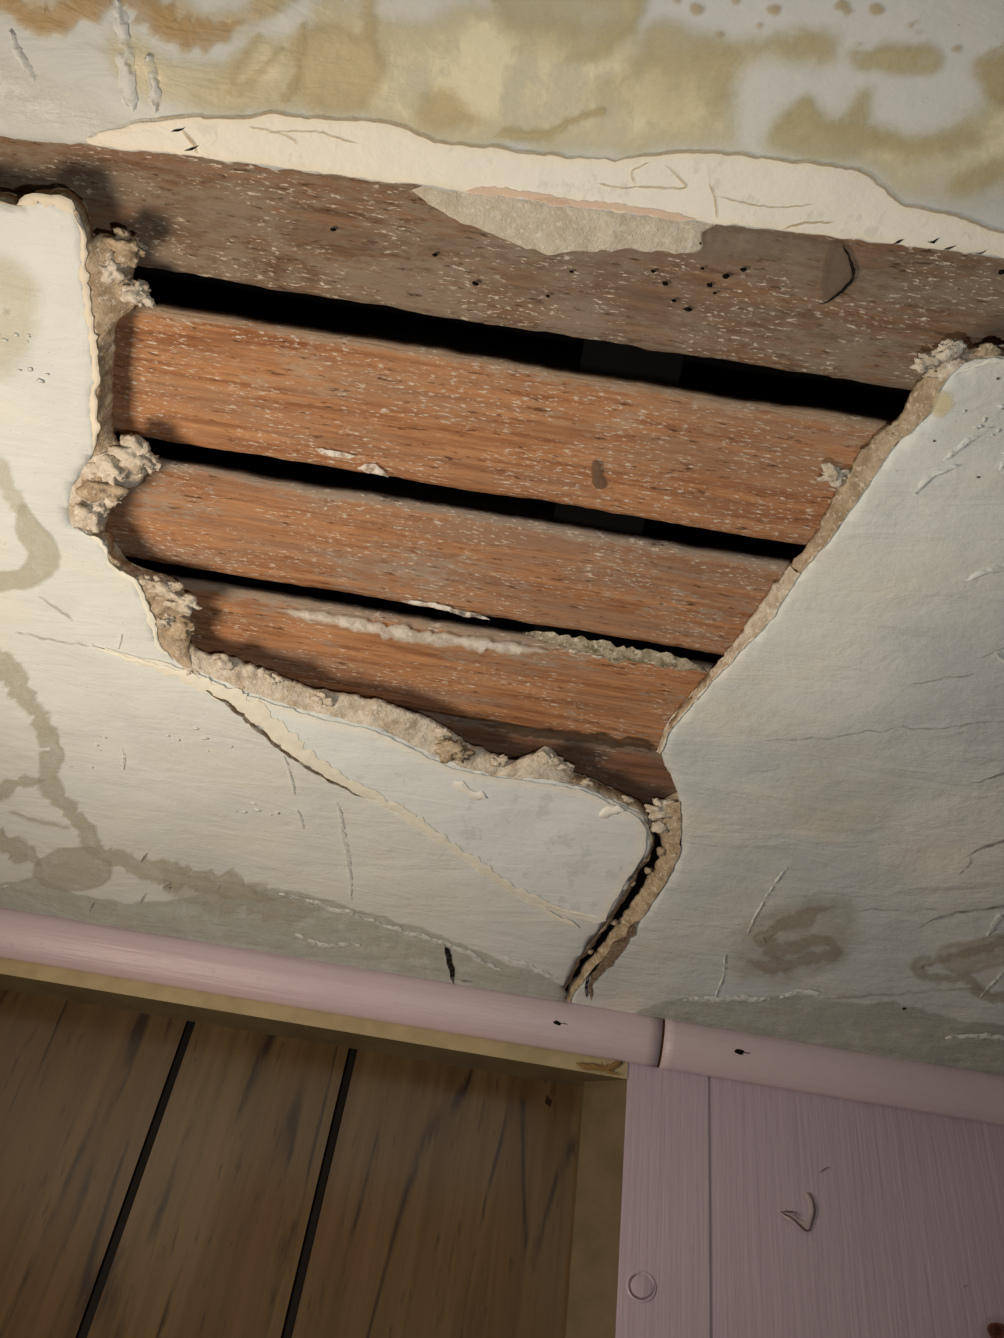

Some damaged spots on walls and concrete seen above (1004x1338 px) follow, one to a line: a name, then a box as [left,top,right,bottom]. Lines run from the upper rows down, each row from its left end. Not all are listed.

damp [0,0,107,34]
damp [113,0,748,151]
peeling [86,0,1004,258]
damp [773,53,1004,189]
damp [854,47,938,72]
damp [0,506,58,591]
peeling [0,188,676,929]
spalling [656,338,1004,754]
damp [0,654,564,1001]
crack [562,792,681,1002]